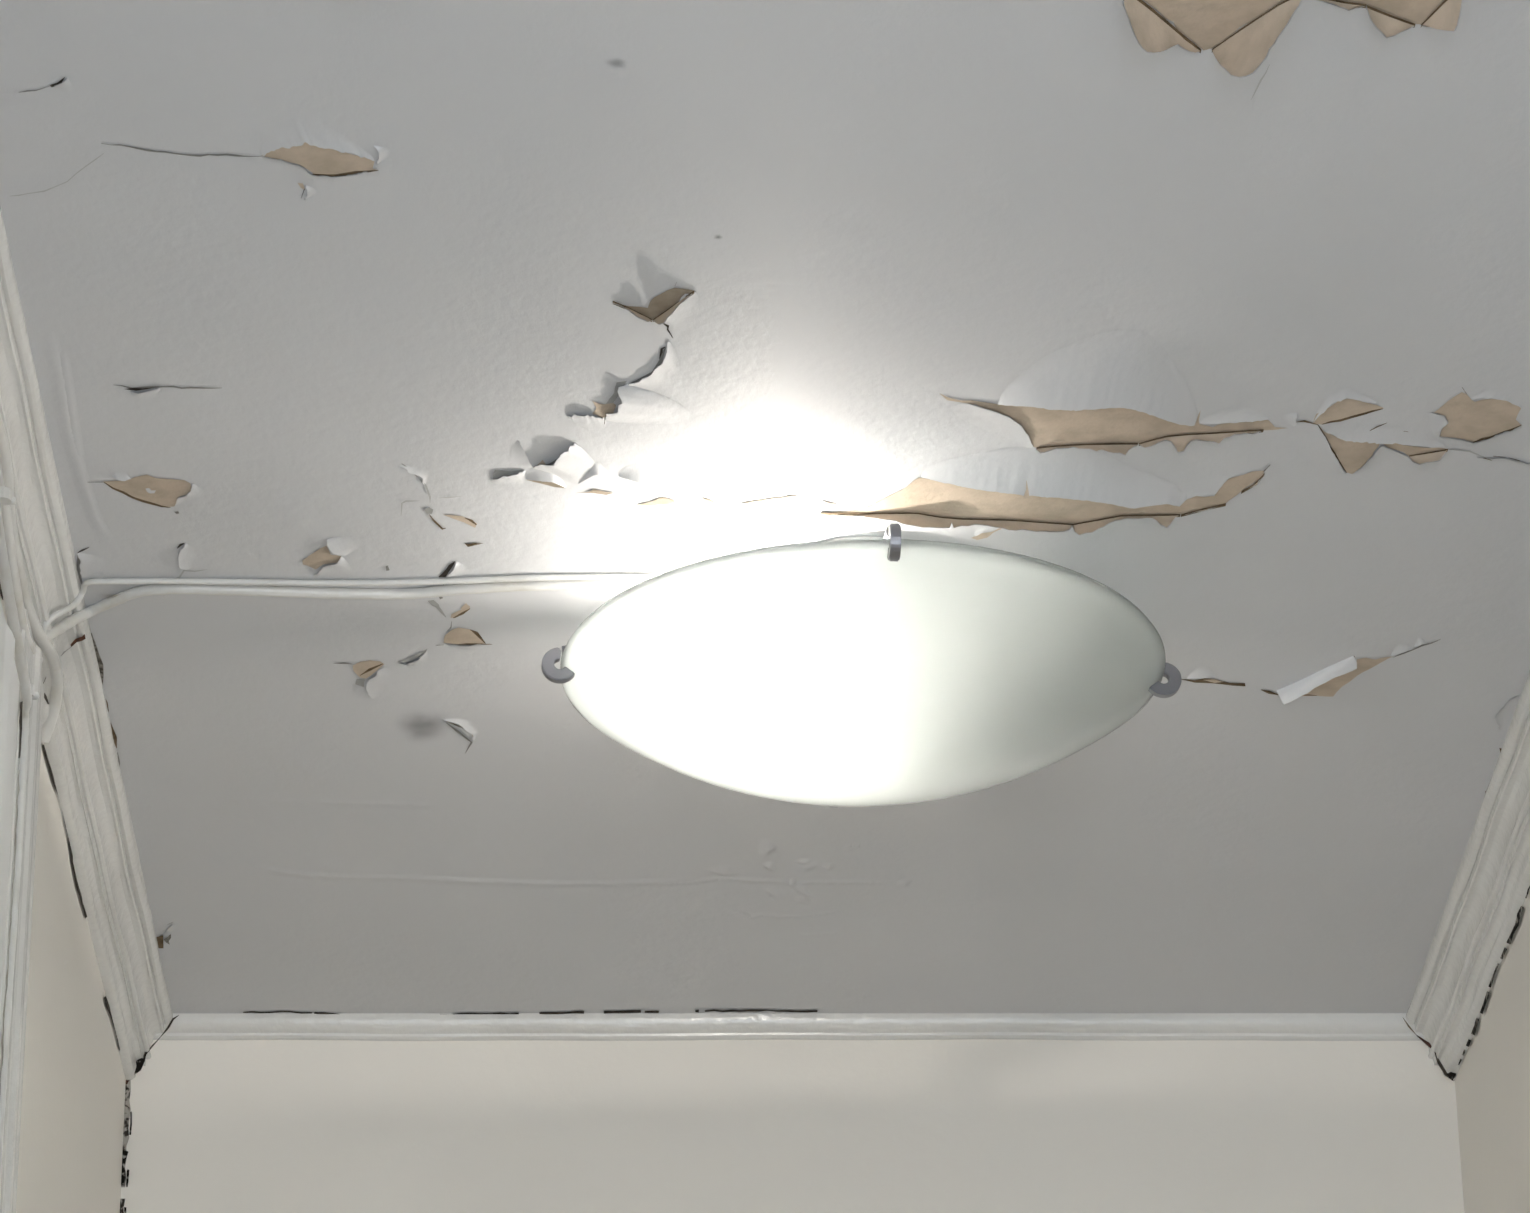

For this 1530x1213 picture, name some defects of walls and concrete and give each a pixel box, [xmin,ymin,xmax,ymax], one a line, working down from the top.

peeling [1113,0,1462,100]
peeling [12,115,391,200]
peeling [612,282,699,338]
peeling [491,381,690,506]
peeling [701,330,1522,540]
peeling [103,471,205,514]
peeling [302,536,363,577]
peeling [333,597,491,698]
peeling [1261,636,1440,704]
peeling [443,718,480,753]